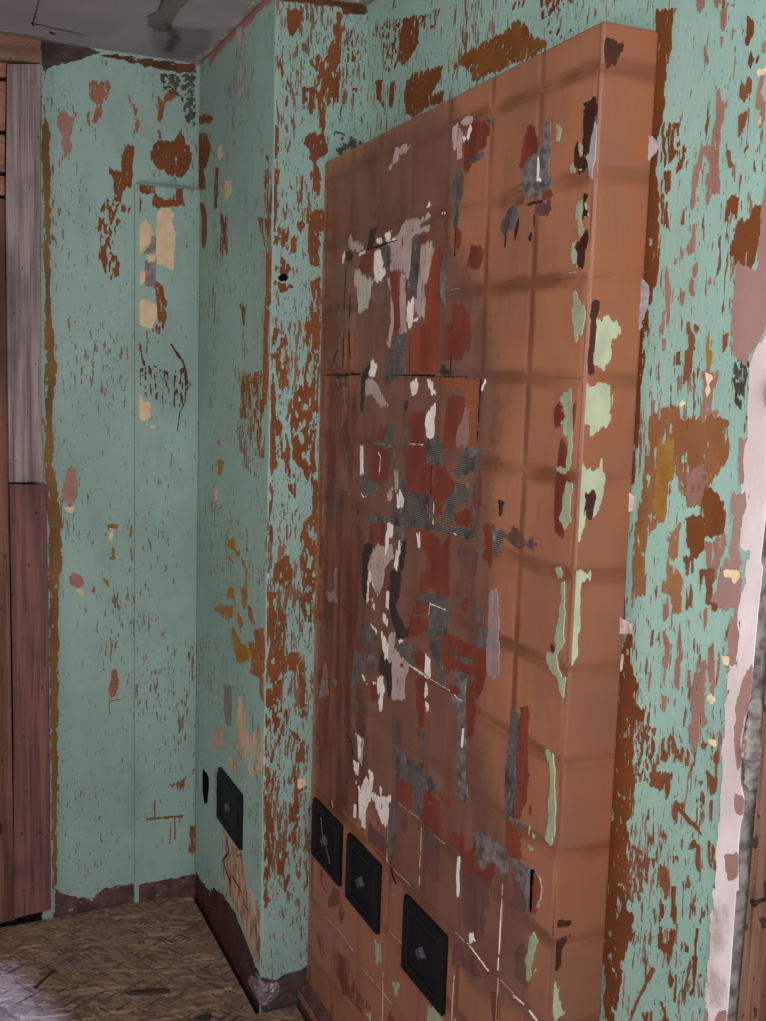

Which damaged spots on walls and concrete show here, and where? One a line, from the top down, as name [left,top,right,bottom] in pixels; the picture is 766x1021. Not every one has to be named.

crack [31,0,83,35]
spalling [41,0,374,1014]
peeling [375,0,572,118]
spalling [603,0,766,1021]